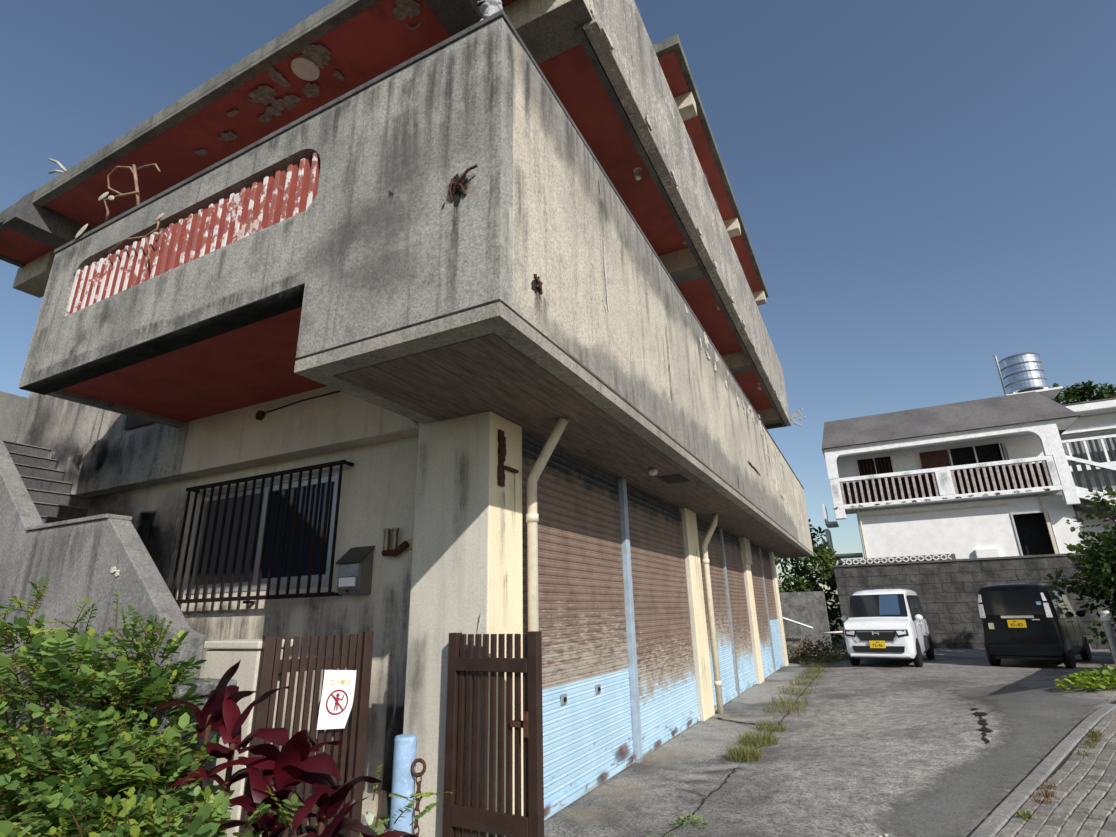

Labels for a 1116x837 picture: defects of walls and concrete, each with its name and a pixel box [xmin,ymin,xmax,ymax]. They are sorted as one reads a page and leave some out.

peeling [297,44,344,81]
peeling [227,67,321,123]
rust [619,740,662,760]
crack [661,671,822,837]